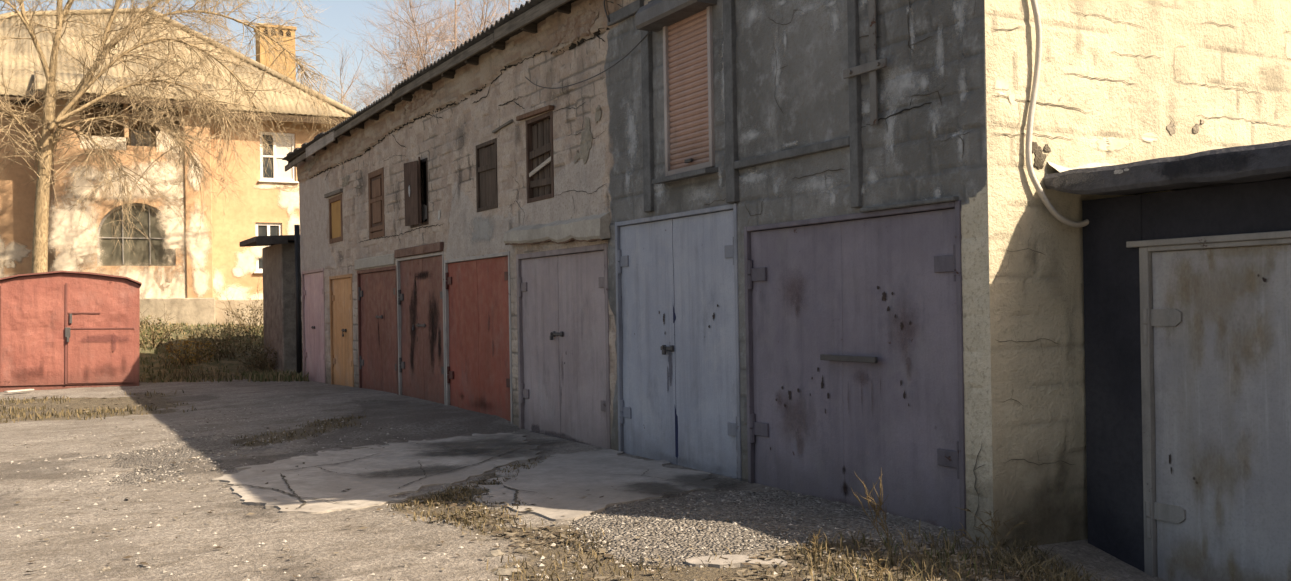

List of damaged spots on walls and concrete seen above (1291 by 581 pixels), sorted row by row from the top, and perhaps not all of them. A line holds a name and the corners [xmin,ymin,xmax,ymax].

crack [310,0,622,180]
crack [861,87,944,128]
crack [939,7,1291,159]
flaking render [0,239,31,278]
flaking render [48,147,267,300]
flaking render [257,182,300,235]
water stain [410,272,441,369]